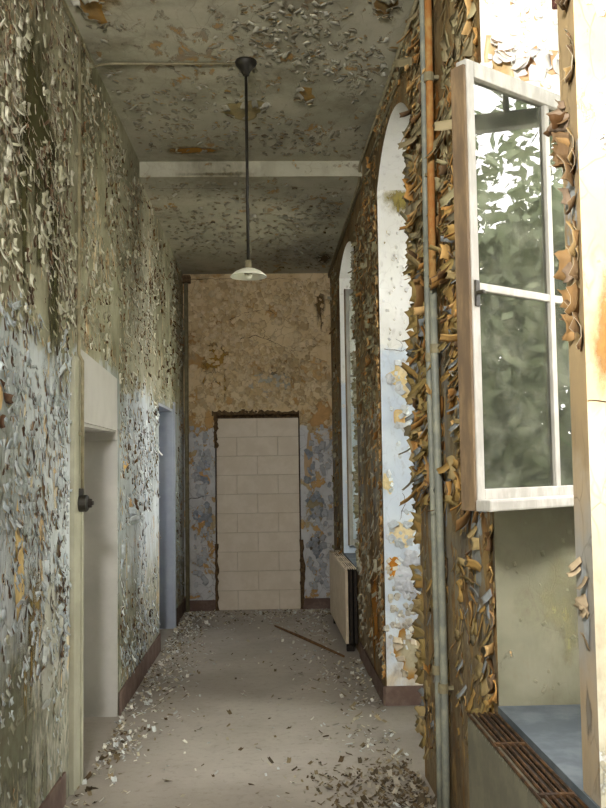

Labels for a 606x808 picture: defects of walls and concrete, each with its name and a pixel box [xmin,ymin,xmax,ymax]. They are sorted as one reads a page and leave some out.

peeling [0,0,387,808]
peeling [346,0,575,760]
peeling [543,100,583,352]